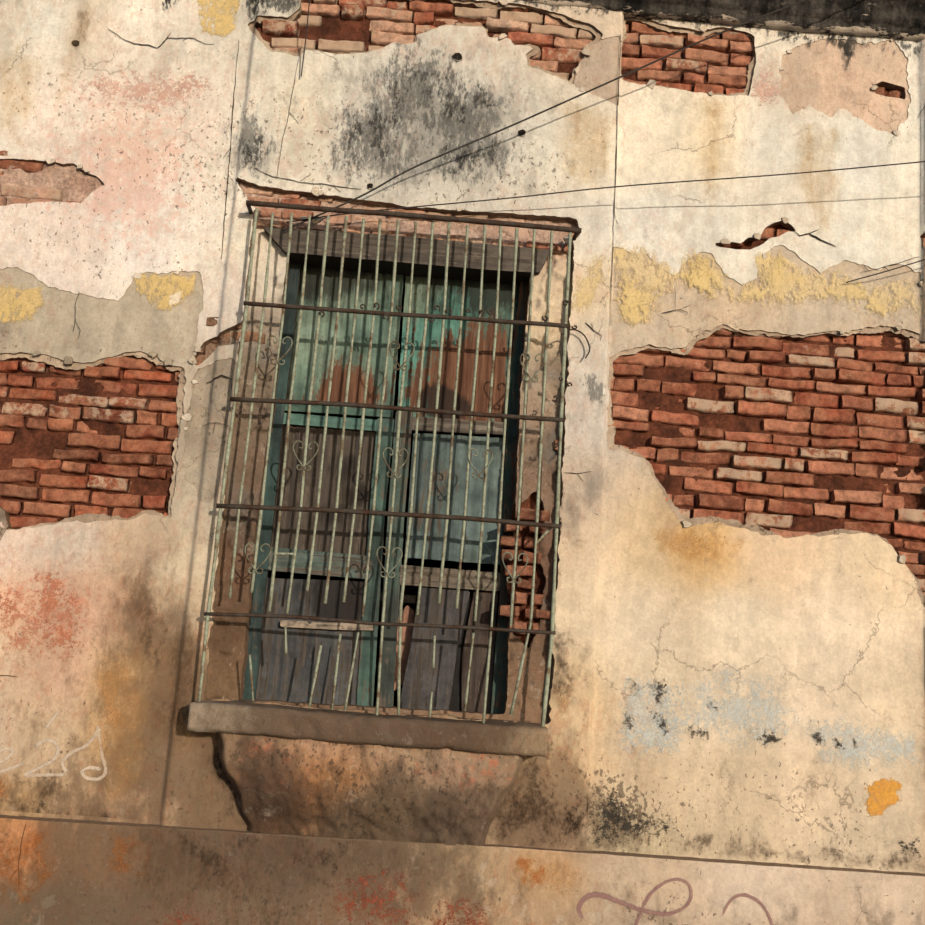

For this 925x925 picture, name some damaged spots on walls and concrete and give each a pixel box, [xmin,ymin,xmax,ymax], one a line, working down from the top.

spalling [0,150,104,206]
leakage [349,67,428,161]
leakage [442,84,490,125]
leakage [453,143,497,173]
spalling [248,0,755,105]
peeling [779,38,911,137]
spalling [0,268,267,541]
spalling [606,217,925,607]
spalling [498,492,551,648]
leakage [586,784,679,847]